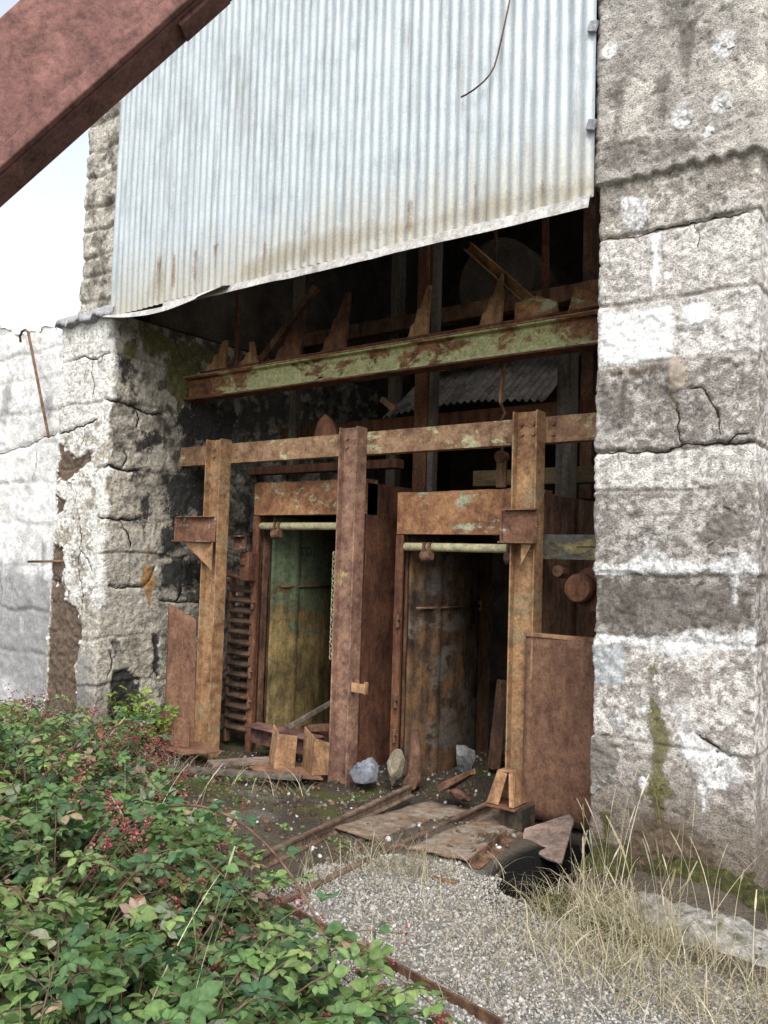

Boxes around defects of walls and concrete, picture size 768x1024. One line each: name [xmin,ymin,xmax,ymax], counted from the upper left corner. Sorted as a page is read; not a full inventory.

damp [113,351,135,385]
peeling [55,444,94,515]
crack [0,353,161,479]
damp [129,426,161,479]
damp [175,396,238,447]
crack [600,386,755,454]
crack [78,517,199,612]
damp [134,467,205,600]
spalling [44,542,82,714]
damp [620,703,743,868]